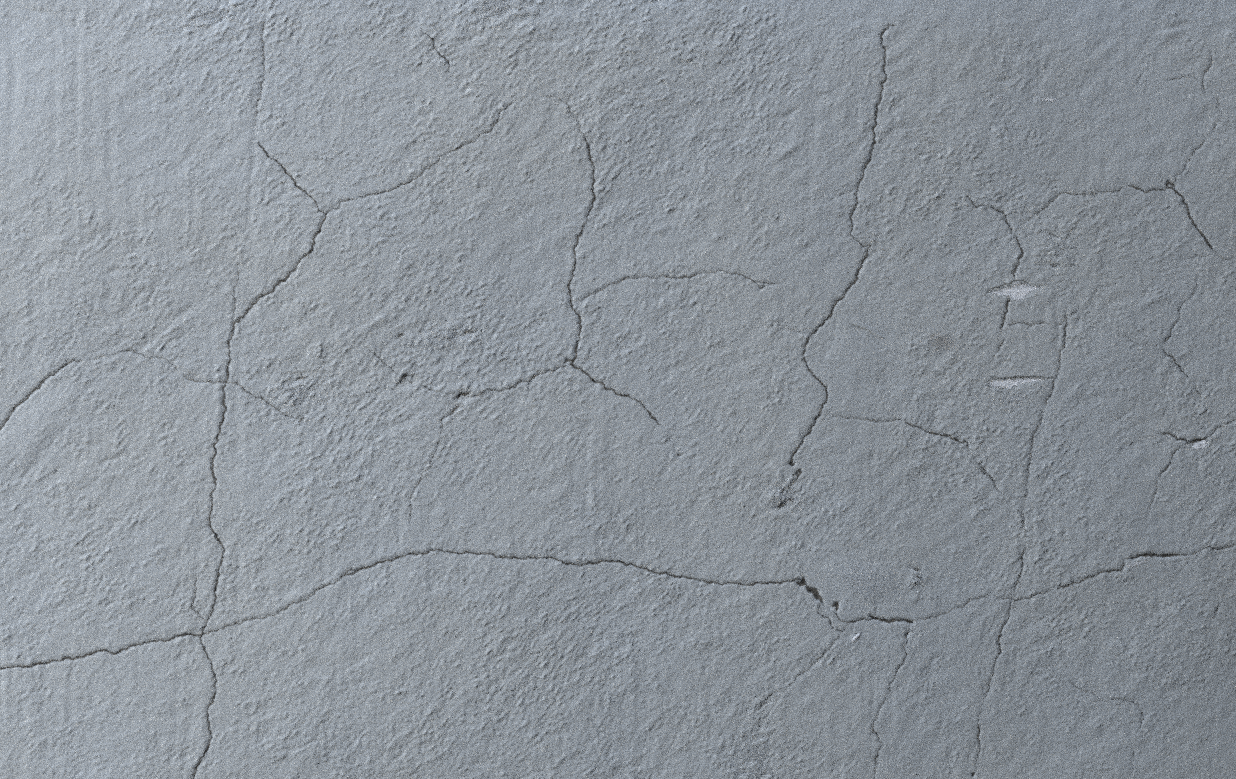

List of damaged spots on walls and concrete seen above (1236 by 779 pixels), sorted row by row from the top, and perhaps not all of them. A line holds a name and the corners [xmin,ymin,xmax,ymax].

crack [255,15,267,126]
crack [421,31,451,75]
crack [967,50,1235,278]
crack [782,24,1005,497]
spalling [990,278,1039,300]
crack [0,96,1048,779]
spalling [987,376,1053,388]
crack [991,299,1077,532]
crack [1121,293,1202,399]
crack [1150,421,1232,510]
crack [1058,544,1236,589]
crack [1071,682,1144,773]